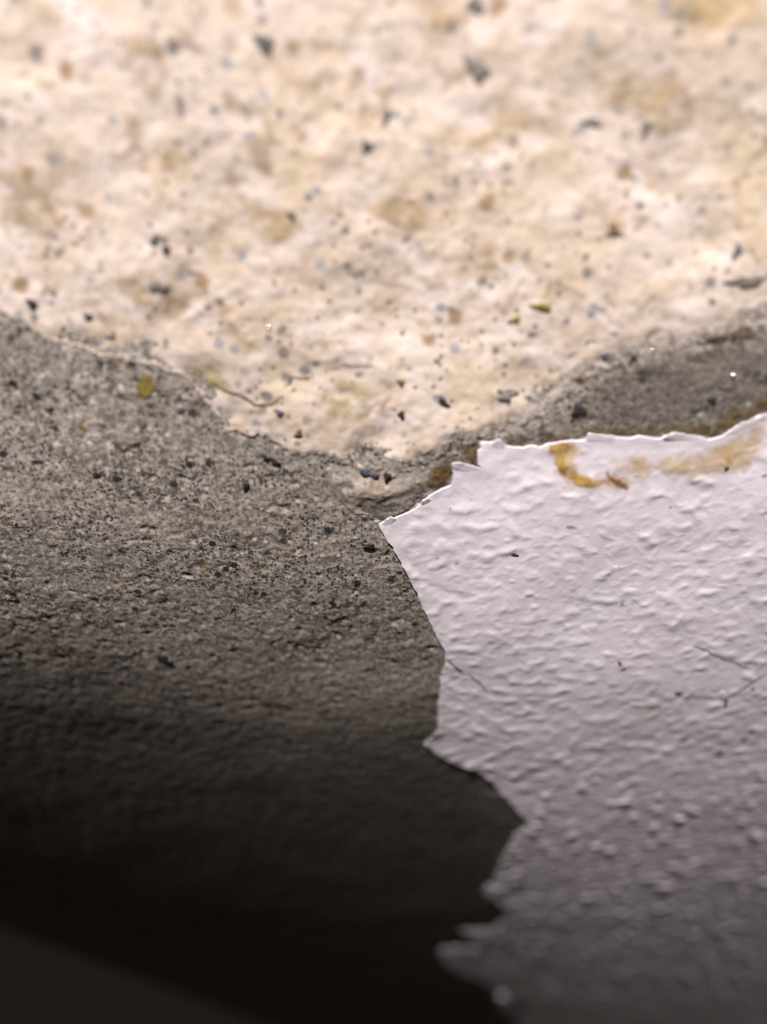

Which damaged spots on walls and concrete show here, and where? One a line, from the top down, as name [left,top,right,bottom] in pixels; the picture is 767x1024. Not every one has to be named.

peeling [379,413,767,1024]